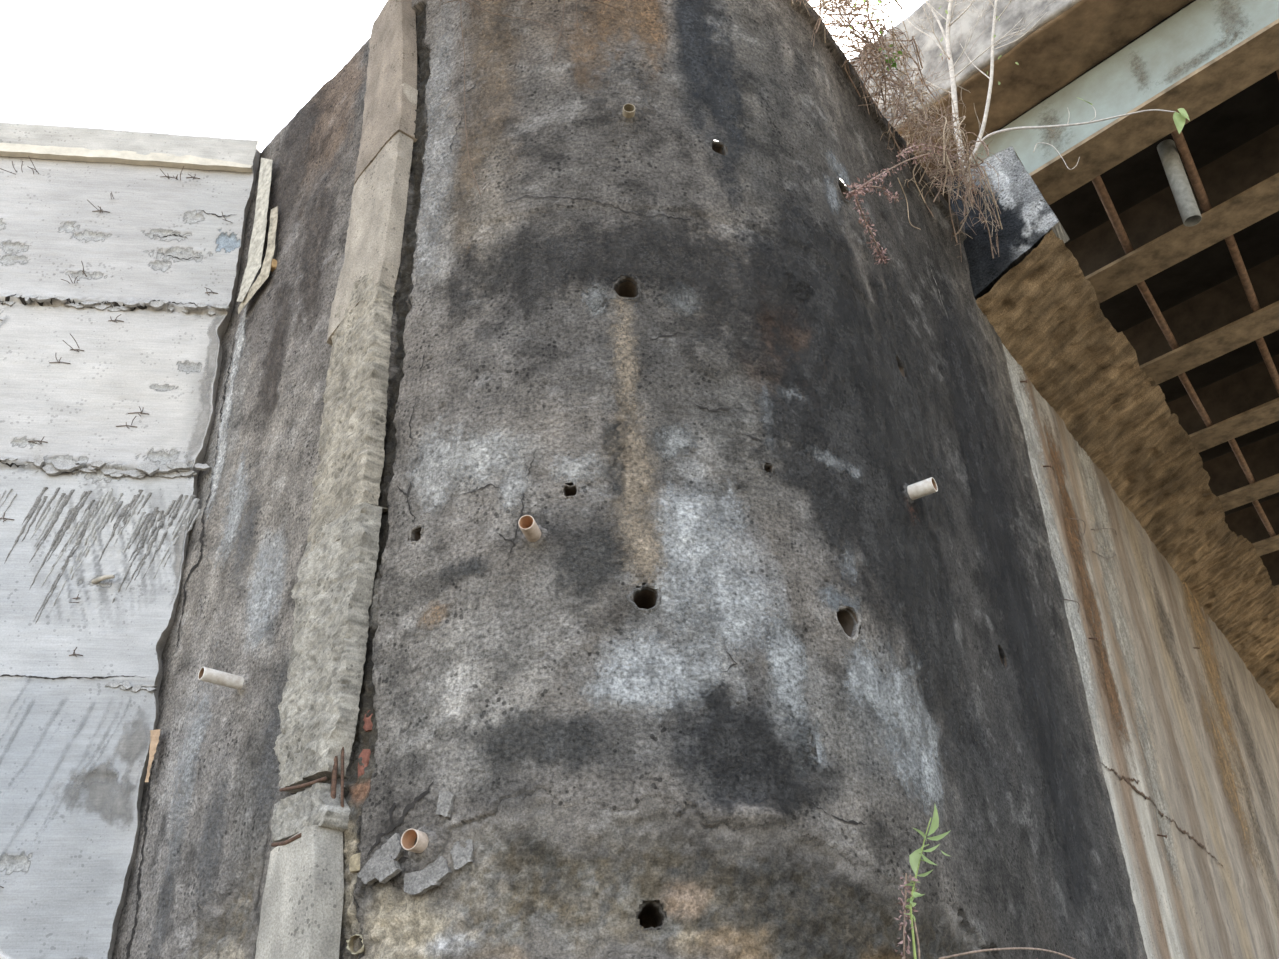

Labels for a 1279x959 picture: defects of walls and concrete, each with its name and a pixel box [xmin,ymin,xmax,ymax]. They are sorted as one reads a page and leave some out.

leakage [676,0,746,206]
leakage [827,154,850,211]
spalling [143,211,240,272]
spalling [1,293,230,317]
spalling [0,437,211,484]
crack [397,350,427,526]
leakage [413,418,527,507]
spalling [279,6,997,959]
leakage [442,204,1099,909]
crack [367,781,434,862]
crack [1101,763,1225,870]
spalling [174,806,301,959]